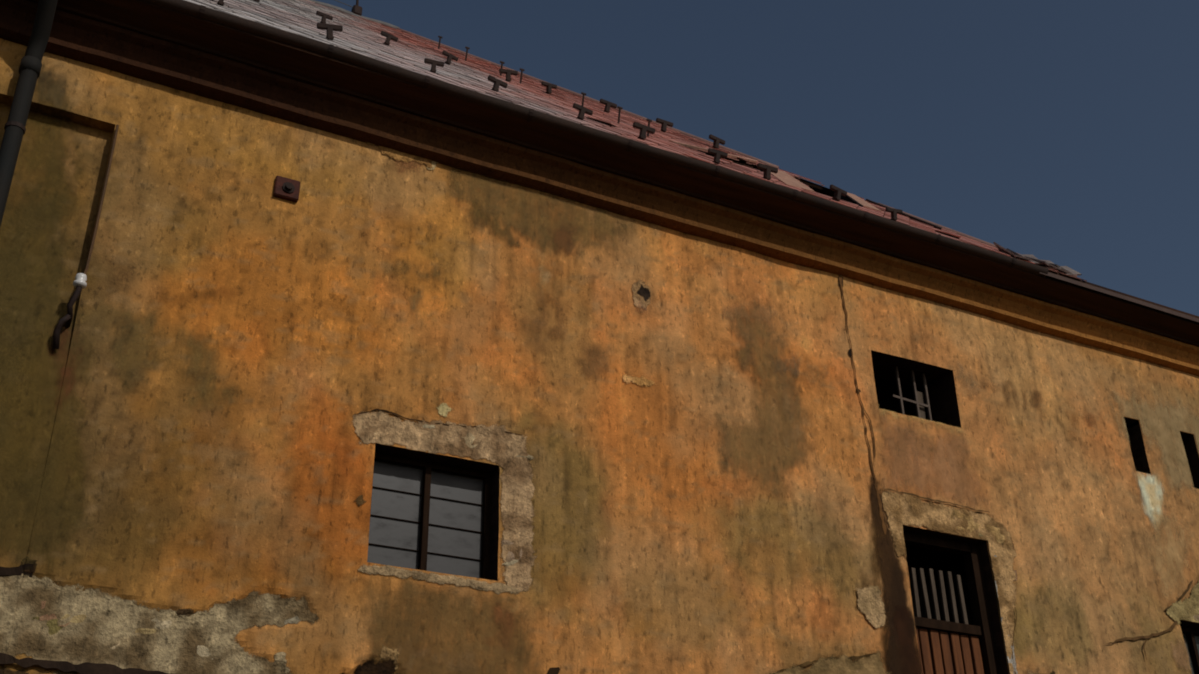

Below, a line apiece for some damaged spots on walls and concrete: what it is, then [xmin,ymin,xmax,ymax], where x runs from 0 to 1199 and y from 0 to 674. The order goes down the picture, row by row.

leakage [720,306,819,494]
crack [838,275,887,534]
peeling [353,403,537,595]
spalling [0,574,319,674]
spalling [340,646,399,674]
spalling [771,651,886,674]
spalling [857,586,886,628]
peeling [882,488,1055,674]
crack [1107,621,1178,660]
spalling [1165,580,1199,624]